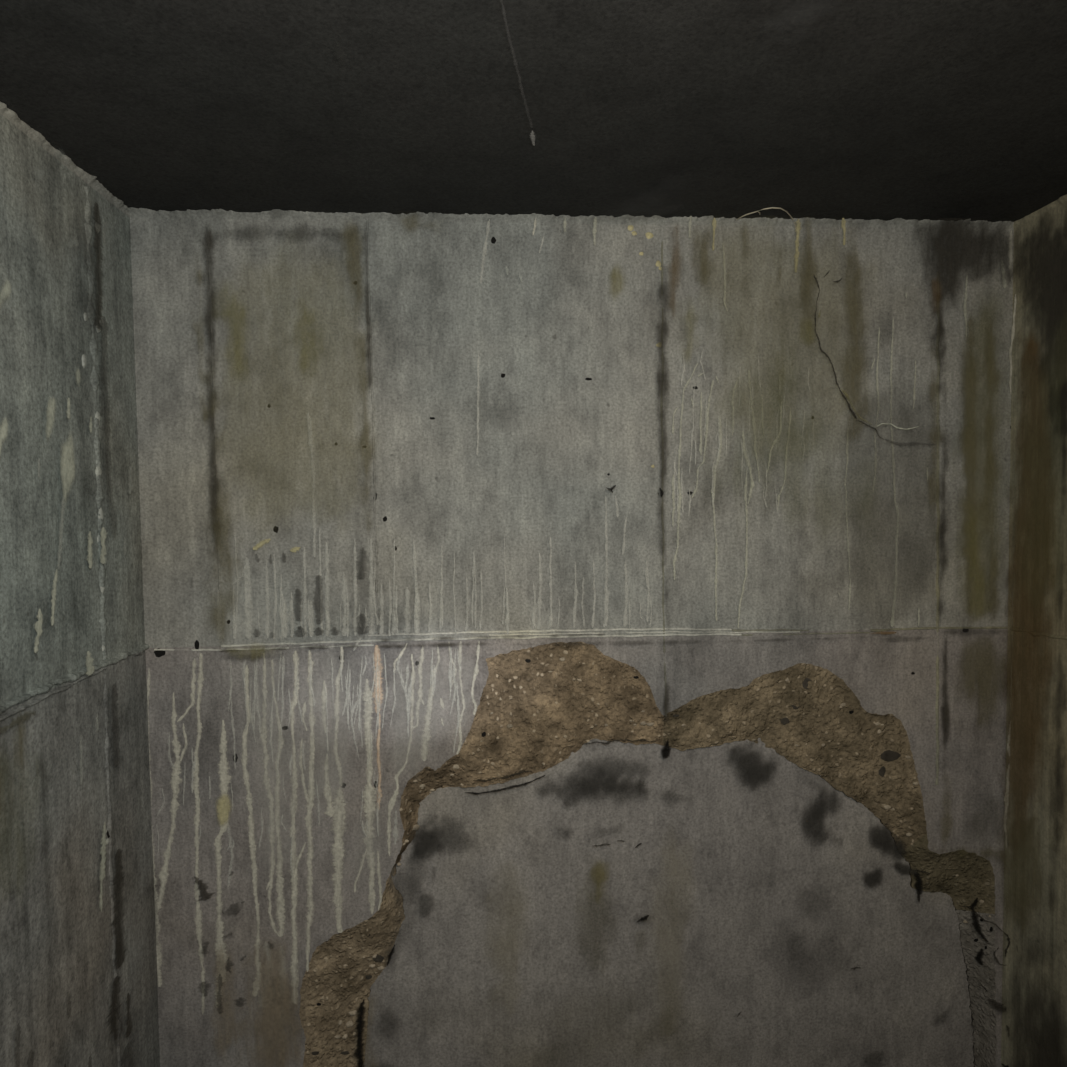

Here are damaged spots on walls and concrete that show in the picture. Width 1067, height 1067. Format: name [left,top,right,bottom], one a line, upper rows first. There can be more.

damp [656,322,668,395]
crack [814,271,919,440]
damp [927,218,1067,476]
damp [34,436,75,653]
damp [87,508,106,568]
damp [651,363,791,627]
damp [152,646,346,1014]
damp [354,637,480,914]
spalling [299,642,997,1067]
damp [731,748,775,788]
damp [803,795,837,841]
damp [871,827,917,874]